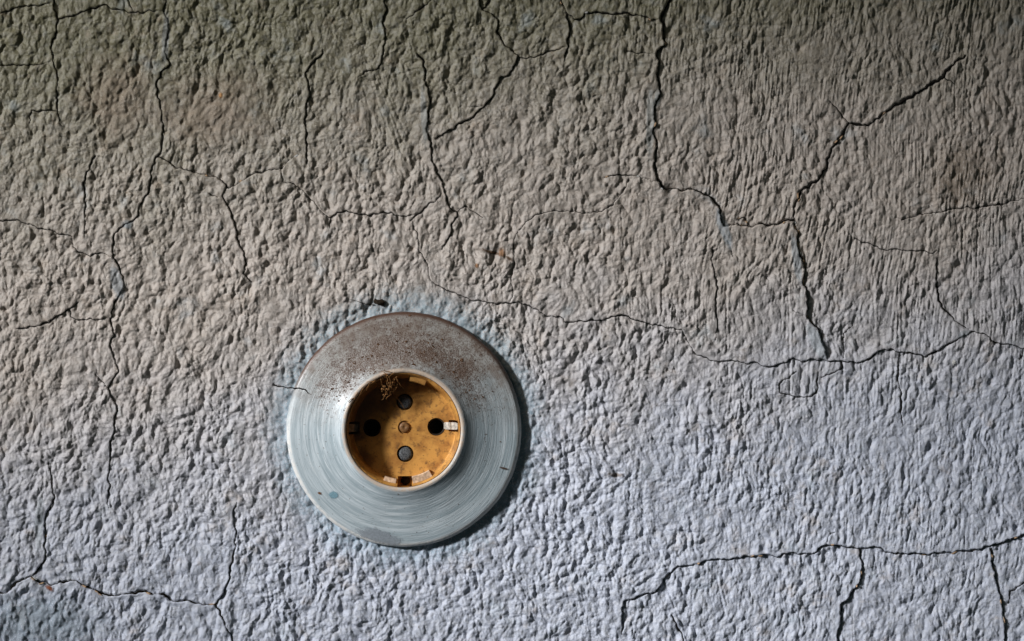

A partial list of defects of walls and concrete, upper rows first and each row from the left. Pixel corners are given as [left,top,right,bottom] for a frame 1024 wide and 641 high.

crack [0,0,1024,508]
crack [0,462,237,641]
crack [621,532,1024,640]